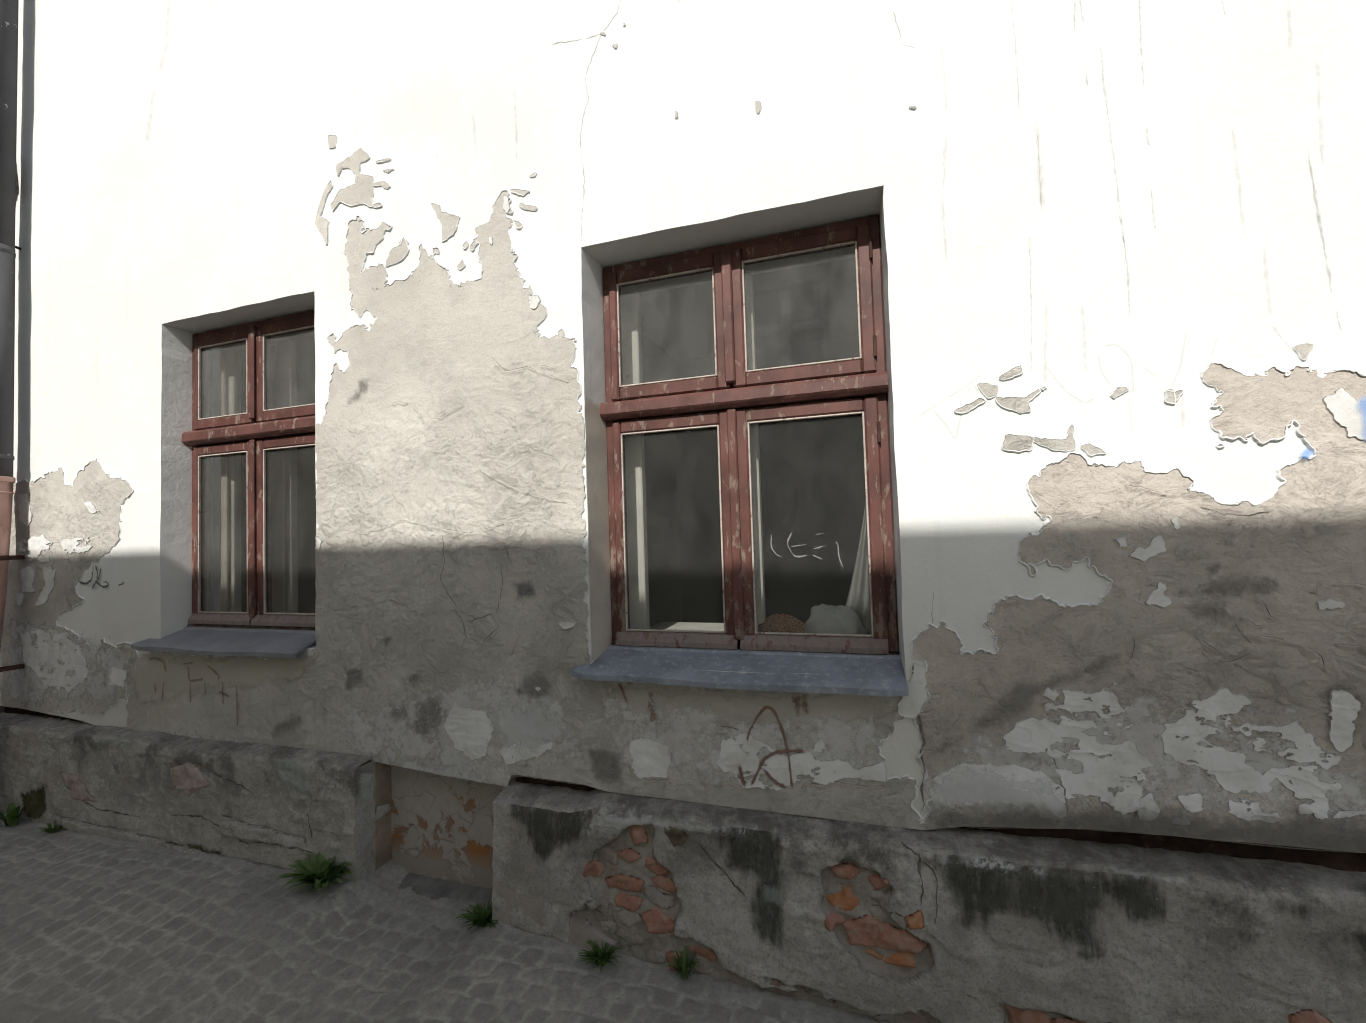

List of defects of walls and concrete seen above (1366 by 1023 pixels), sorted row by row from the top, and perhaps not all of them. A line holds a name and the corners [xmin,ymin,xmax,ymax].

peeling [0,134,1366,851]
leakage [928,694,1366,853]
leakage [511,804,783,944]
spalling [570,823,942,1023]
leakage [935,855,1166,959]
spalling [1000,1002,1087,1023]
spalling [1288,1009,1333,1023]